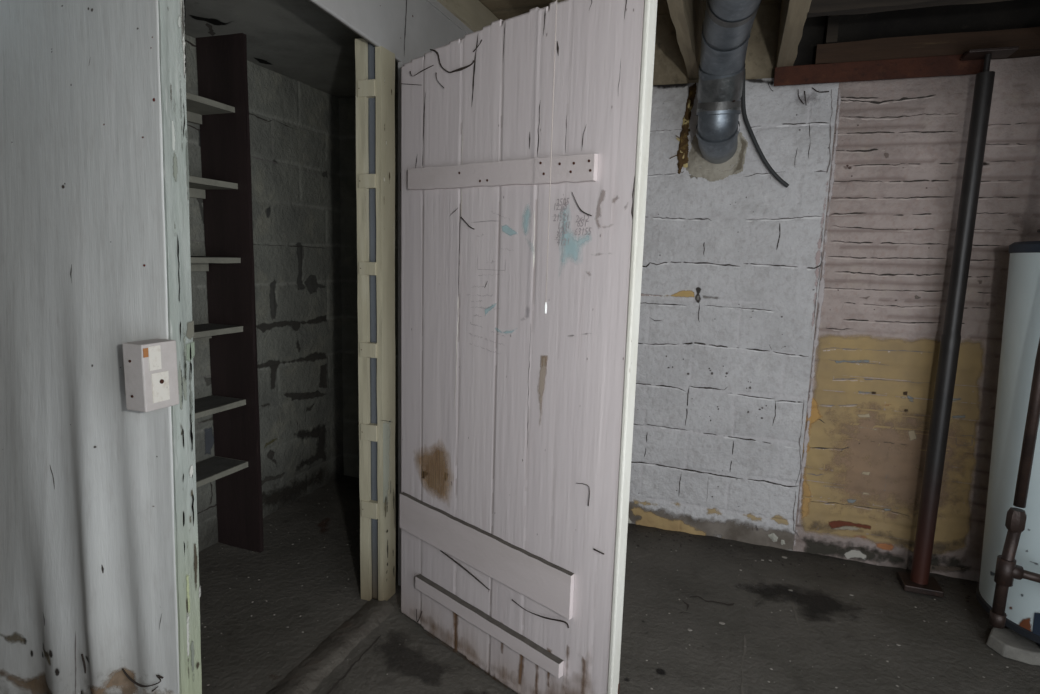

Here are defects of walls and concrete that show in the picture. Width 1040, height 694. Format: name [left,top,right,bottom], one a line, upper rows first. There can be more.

peeling [628,335,940,552]
peeling [932,341,983,554]
damp [749,585,843,619]
damp [0,648,52,694]
damp [90,668,136,694]